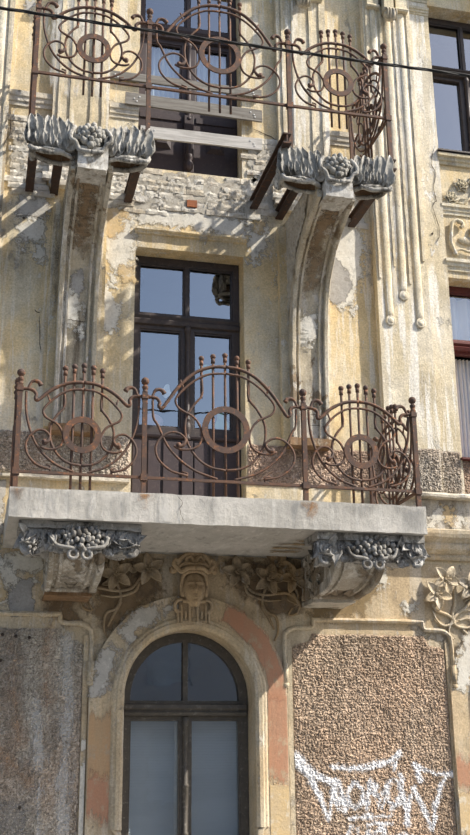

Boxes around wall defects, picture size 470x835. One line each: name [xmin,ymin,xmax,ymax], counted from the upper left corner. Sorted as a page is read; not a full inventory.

flaking render [51,0,78,87]
flaking render [95,0,108,96]
flaking render [0,114,69,266]
flaking render [62,268,92,342]
spalling [72,183,97,252]
flaking render [104,138,287,336]
flaking render [296,306,318,352]
flaking render [329,200,371,321]
spalling [0,479,44,617]
flaking render [88,596,183,698]
flaking render [453,632,470,695]